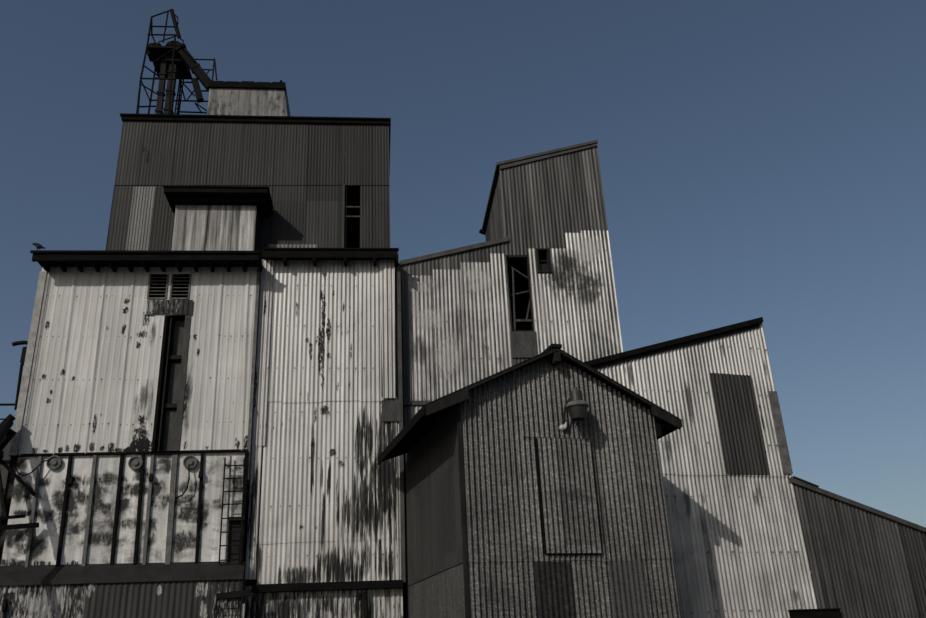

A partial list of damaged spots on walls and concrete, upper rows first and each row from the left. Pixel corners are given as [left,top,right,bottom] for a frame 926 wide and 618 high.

corrosion [136,312,155,348]
corrosion [305,290,334,389]
corrosion [58,414,124,454]
corrosion [132,388,153,448]
corrosion [247,466,263,581]
corrosion [315,596,334,618]